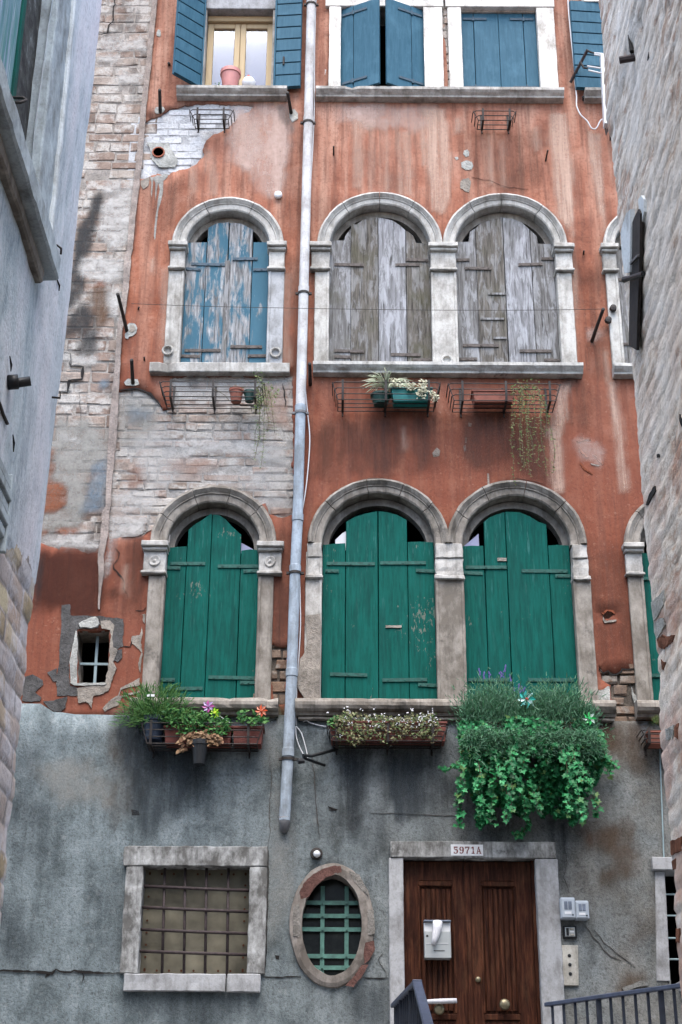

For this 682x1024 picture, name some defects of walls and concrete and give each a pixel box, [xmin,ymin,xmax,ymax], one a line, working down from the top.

damp [346,104,381,138]
damp [422,110,459,210]
damp [551,114,573,225]
damp [589,132,604,212]
flaking render [41,0,294,552]
peeling [22,614,146,712]
flaking render [601,609,616,623]
flaking render [598,664,639,721]